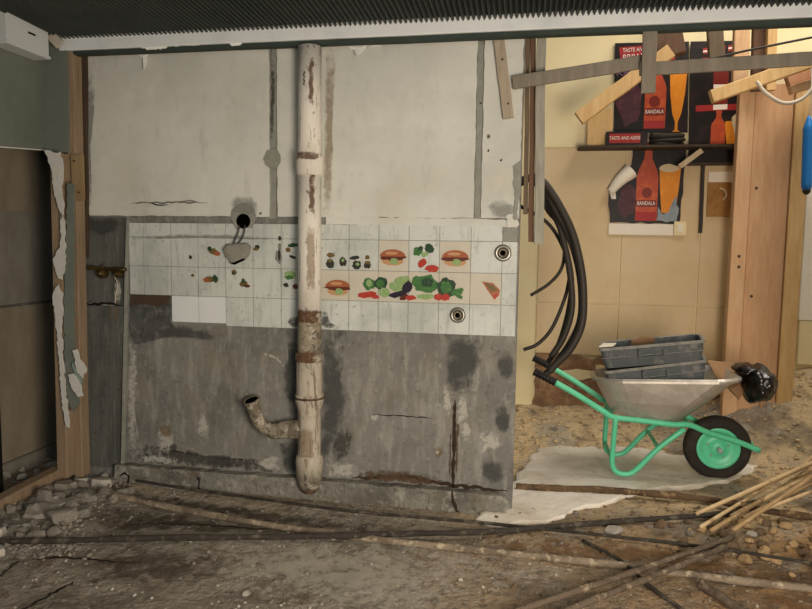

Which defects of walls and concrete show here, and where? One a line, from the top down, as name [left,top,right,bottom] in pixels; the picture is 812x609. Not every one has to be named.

rust [303,59,314,102]
crack [131,199,204,207]
peeling [44,150,87,428]
rust [298,309,318,323]
rust [296,352,315,363]
damp [443,342,480,440]
crack [371,413,427,421]
damp [479,408,509,452]
crack [449,401,459,512]
damp [483,464,502,481]
crack [0,556,137,577]
crack [22,580,77,609]